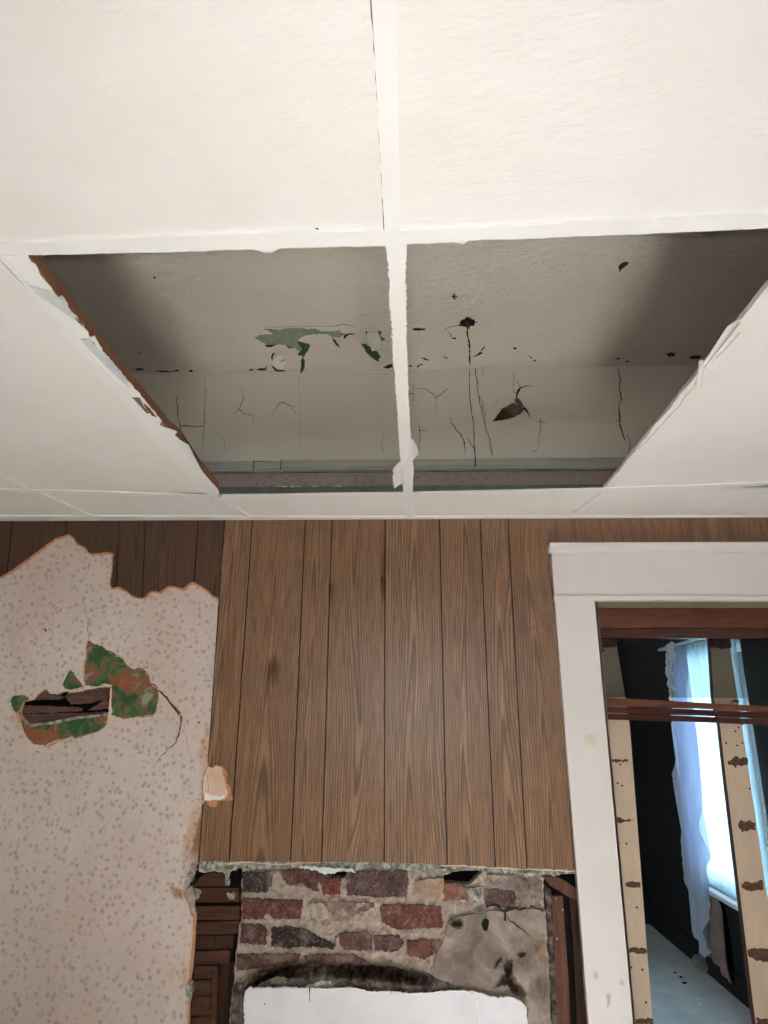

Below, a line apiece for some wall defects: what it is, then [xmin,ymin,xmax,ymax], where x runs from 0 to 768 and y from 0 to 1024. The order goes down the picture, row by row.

peeling [249,327,393,374]
crack [176,378,226,453]
crack [409,329,500,455]
spalling [493,372,533,421]
crack [617,367,630,452]
spalling [10,641,159,747]
crack [157,689,192,764]